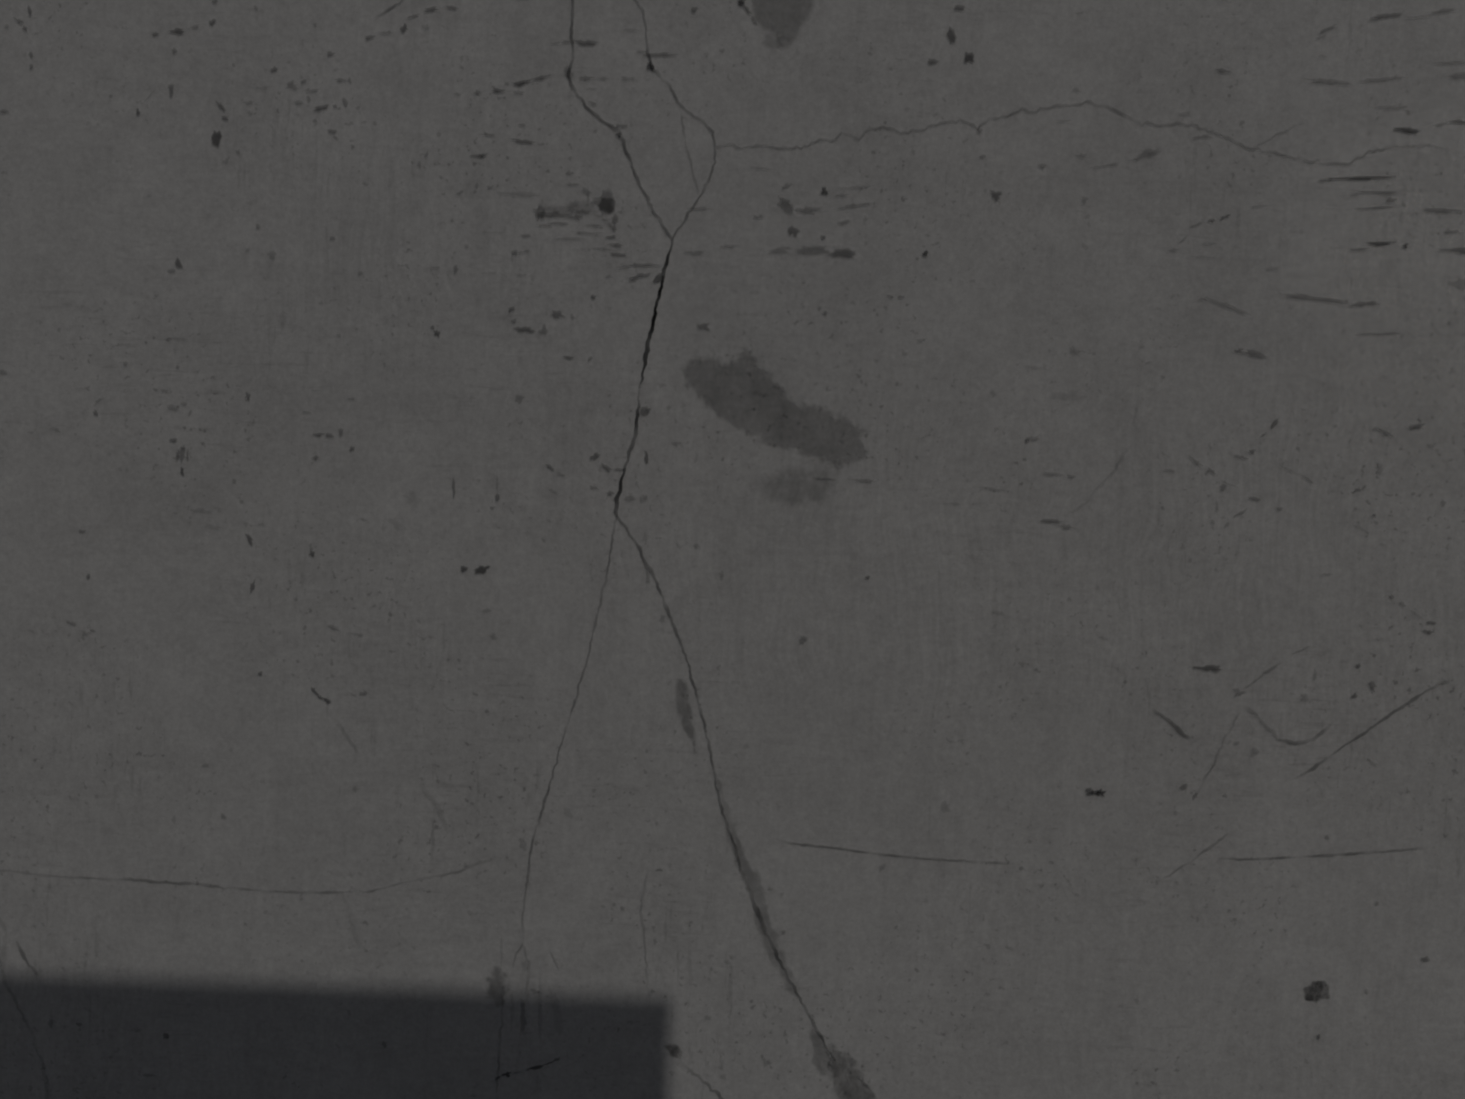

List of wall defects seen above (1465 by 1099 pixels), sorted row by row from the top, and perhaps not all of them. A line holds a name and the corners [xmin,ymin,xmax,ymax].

crack [635,250,671,426]
crack [615,471,625,502]